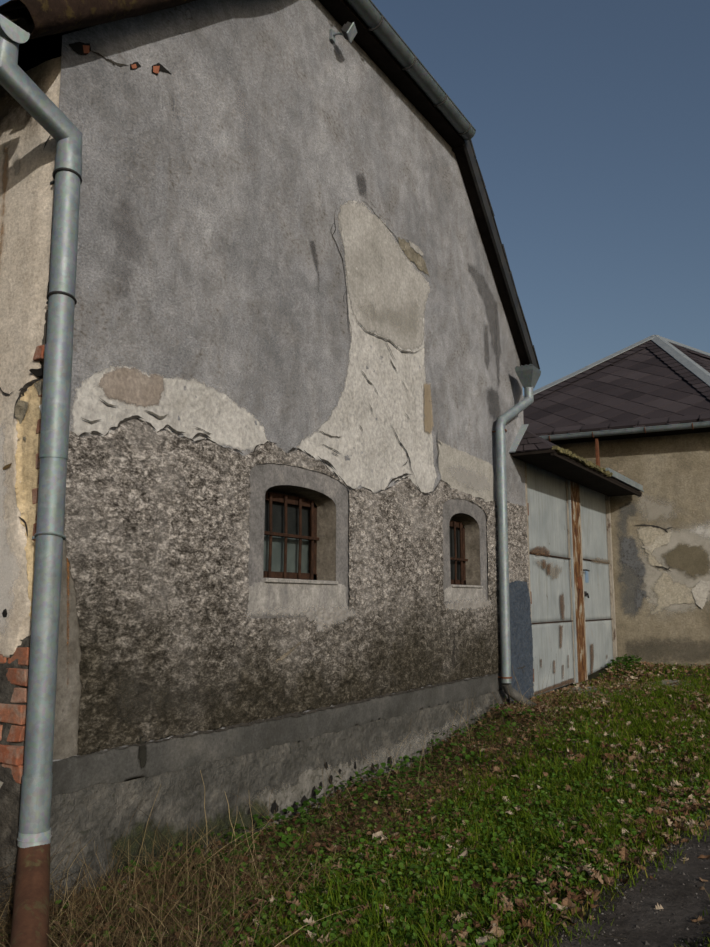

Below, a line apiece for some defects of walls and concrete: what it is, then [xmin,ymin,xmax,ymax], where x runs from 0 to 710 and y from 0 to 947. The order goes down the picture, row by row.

corrosion [0,148,8,254]
flaking render [3,310,48,618]
flaking render [71,366,277,454]
flaking render [289,200,496,502]
crack [635,524,673,533]
water stain [618,496,710,616]
peeling [637,526,710,614]
flaking render [0,635,31,932]